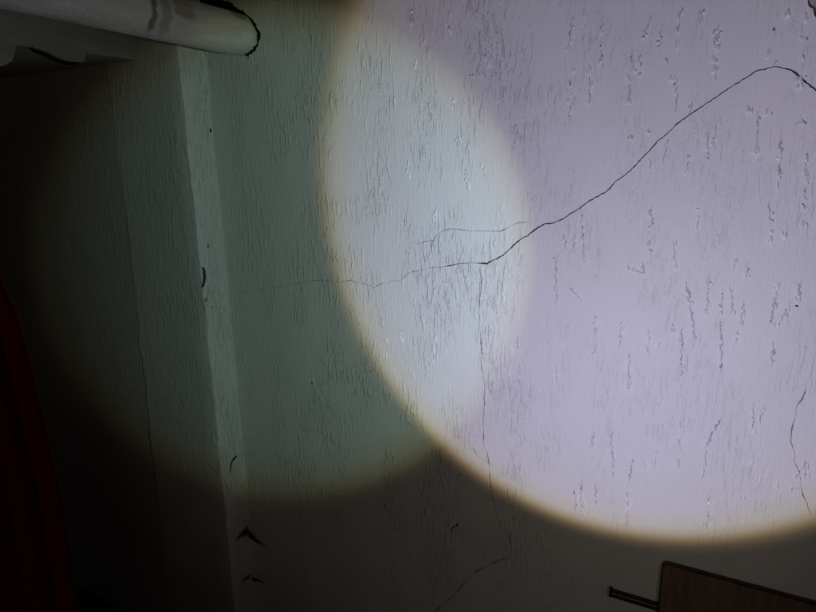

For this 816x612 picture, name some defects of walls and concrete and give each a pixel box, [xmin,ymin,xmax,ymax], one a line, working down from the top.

crack [246,60,816,612]